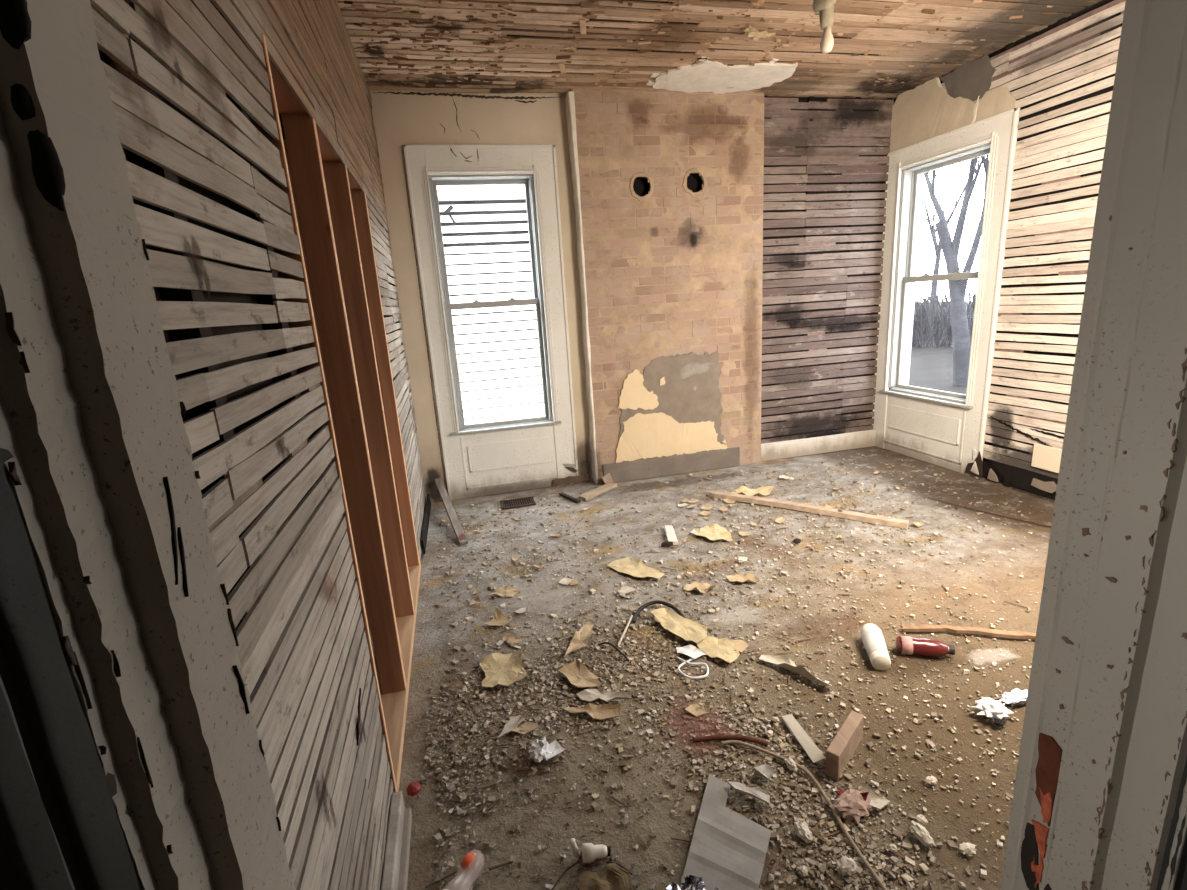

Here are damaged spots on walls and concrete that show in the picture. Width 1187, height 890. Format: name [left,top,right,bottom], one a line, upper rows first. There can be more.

crack [378,92,559,162]
peeling [5,312,30,373]
flaking render [616,369,729,463]
peeling [1163,348,1187,478]
peeling [1135,495,1167,614]
peeling [220,584,239,646]
peeling [62,636,93,709]
peeling [110,650,121,677]
peeling [137,737,153,788]
peeling [1091,629,1138,867]
peeling [1021,733,1063,890]